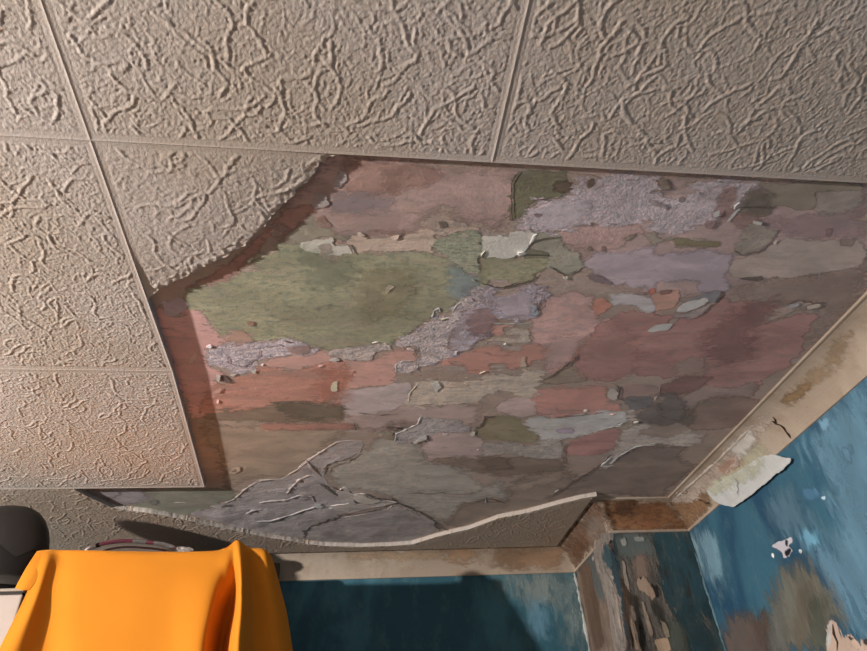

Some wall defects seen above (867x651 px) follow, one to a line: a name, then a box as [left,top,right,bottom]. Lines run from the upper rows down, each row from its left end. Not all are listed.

peeling [74,154,867,547]
damp [781,331,853,406]
crack [772,417,791,438]
crack [382,490,506,531]
peeling [771,529,819,559]
flaking render [825,620,867,651]